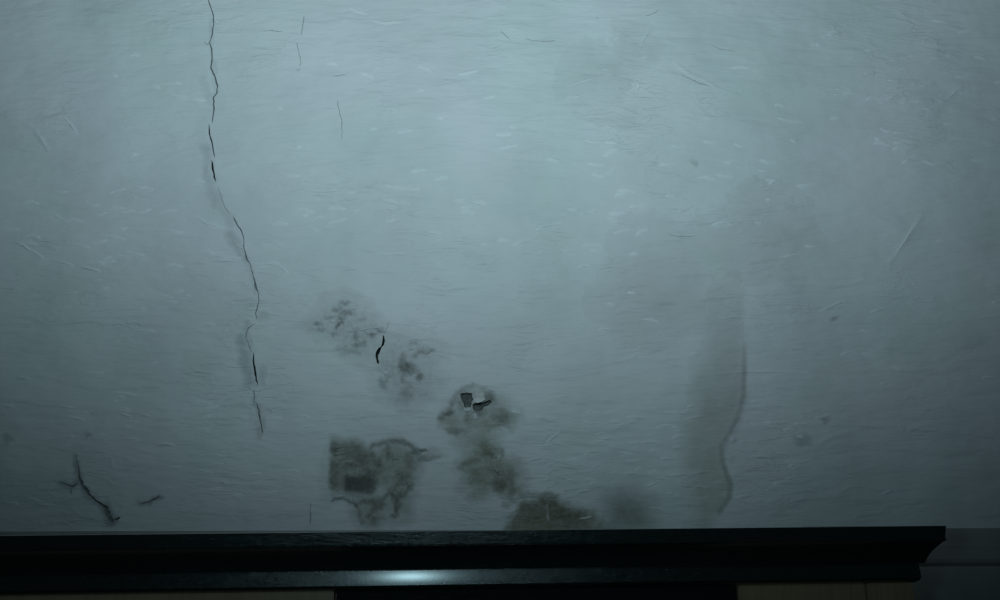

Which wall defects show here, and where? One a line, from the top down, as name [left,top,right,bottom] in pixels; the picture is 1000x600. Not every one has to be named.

crack [195,0,271,434]
crack [375,325,388,364]
flaking render [460,391,492,420]
crack [60,456,120,523]
water stain [511,499,591,530]